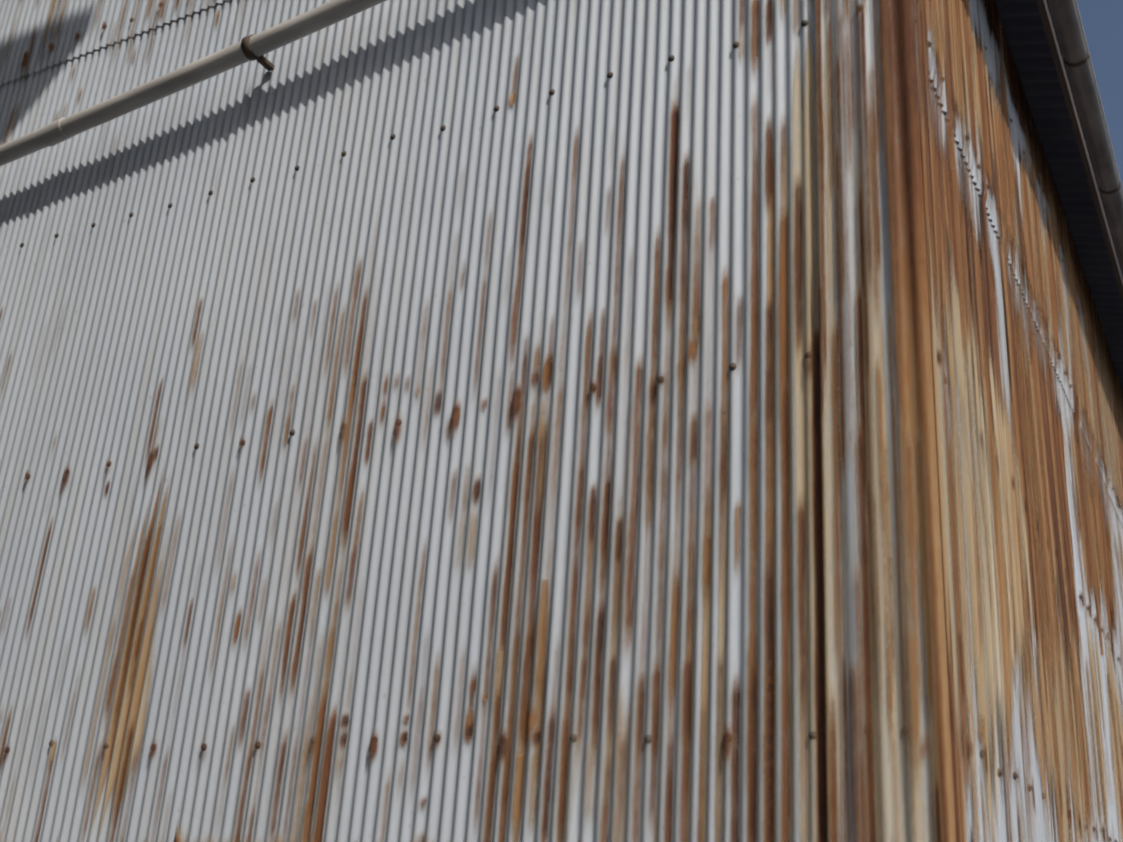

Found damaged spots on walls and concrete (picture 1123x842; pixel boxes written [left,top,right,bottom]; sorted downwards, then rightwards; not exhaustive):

rust [21,0,67,76]
rust [120,0,179,50]
rust [435,291,461,433]
rust [146,383,162,474]
rust [465,0,1123,842]
rust [452,477,481,504]
rust [31,524,52,618]
rust [232,264,420,842]
rust [85,481,167,842]
rust [185,601,193,640]
rust [409,551,426,697]
rust [429,668,439,757]